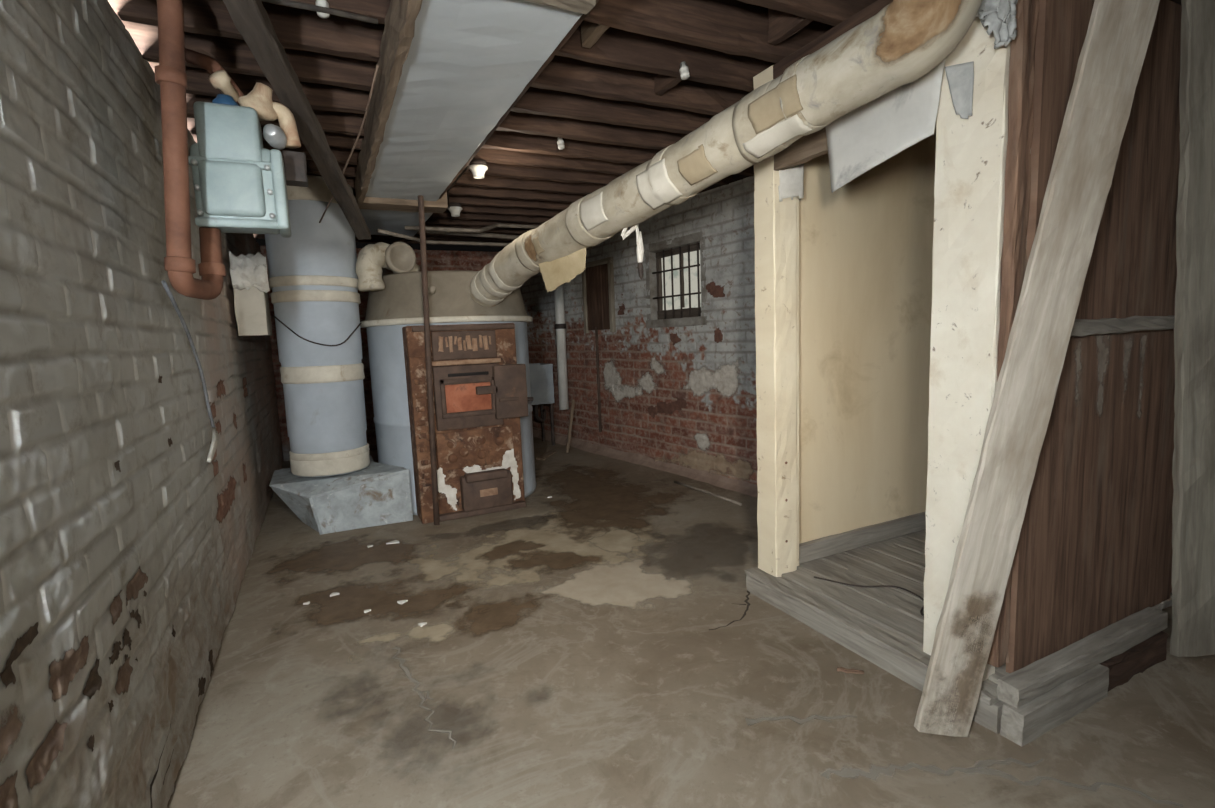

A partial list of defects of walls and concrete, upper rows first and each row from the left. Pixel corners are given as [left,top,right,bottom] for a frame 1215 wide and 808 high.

spalling [706,282,725,298]
spalling [714,328,723,343]
spalling [648,397,687,418]
damp [268,466,683,644]
peeling [0,622,38,688]
peeling [49,566,148,712]
spalling [198,650,214,697]
peeling [0,705,23,762]
peeling [0,721,67,808]